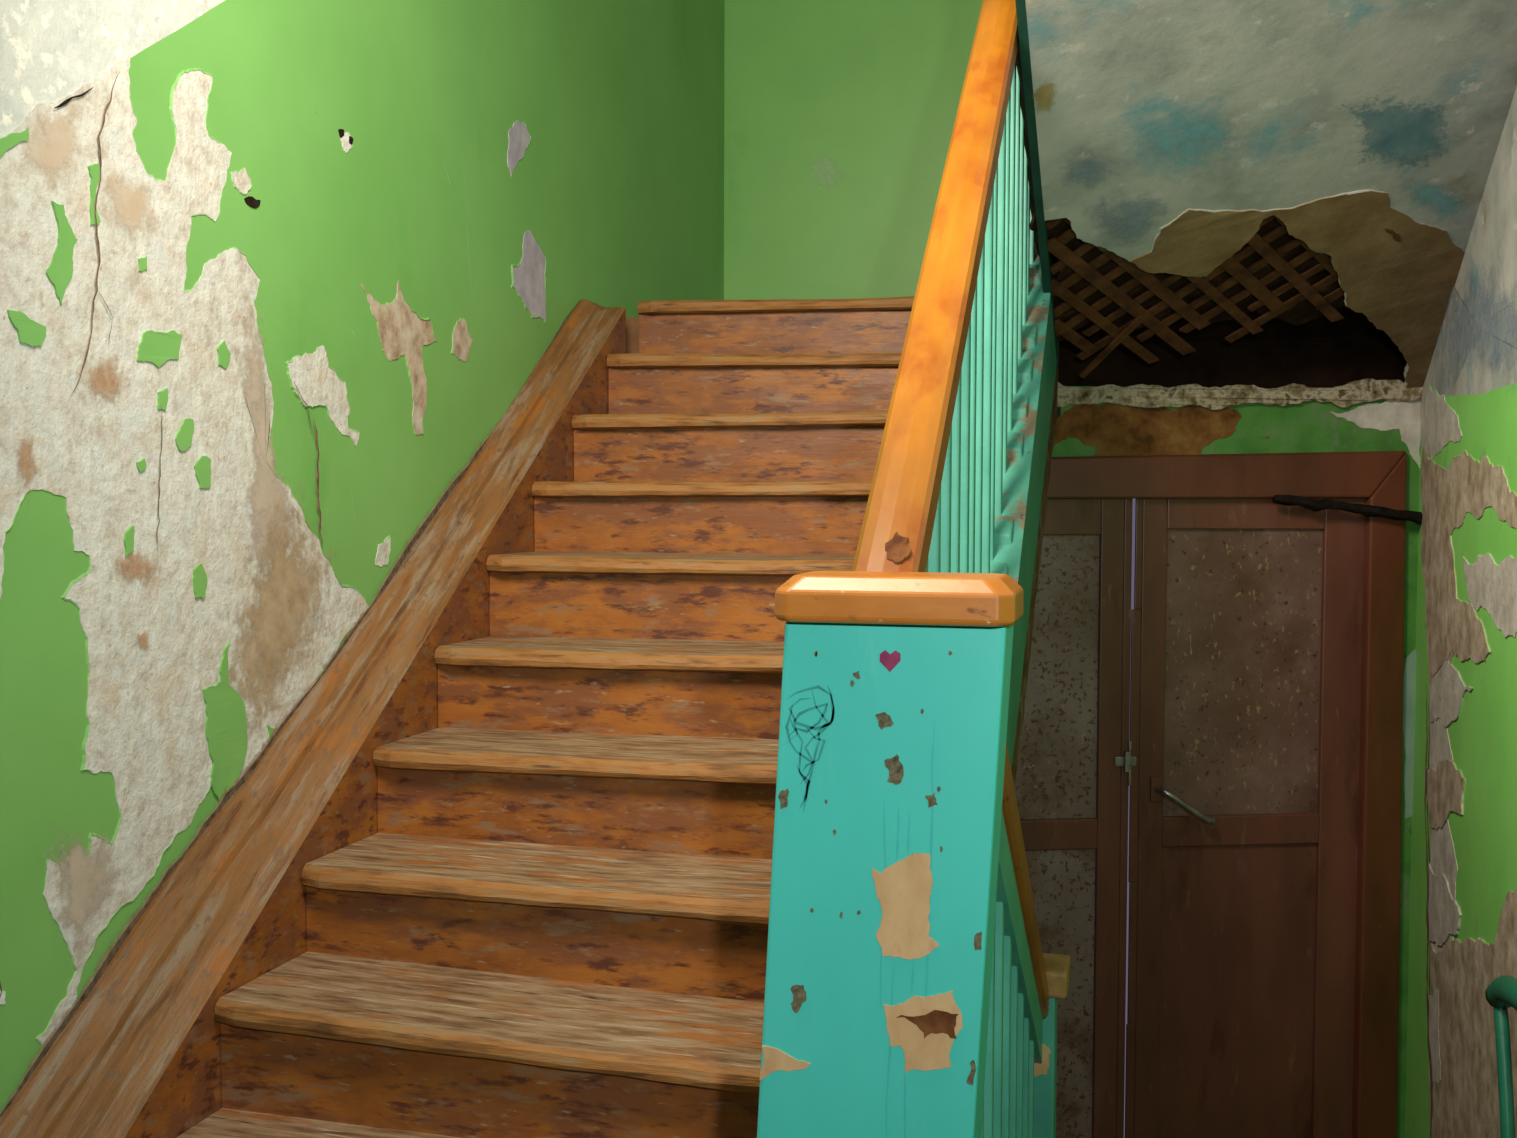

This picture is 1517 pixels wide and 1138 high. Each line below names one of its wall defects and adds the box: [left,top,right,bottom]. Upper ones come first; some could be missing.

crack [55,75,118,396]
peeling [359,280,473,436]
peeling [507,120,531,177]
peeling [511,230,546,324]
peeling [0,54,368,1049]
flaking render [1011,189,1517,1138]